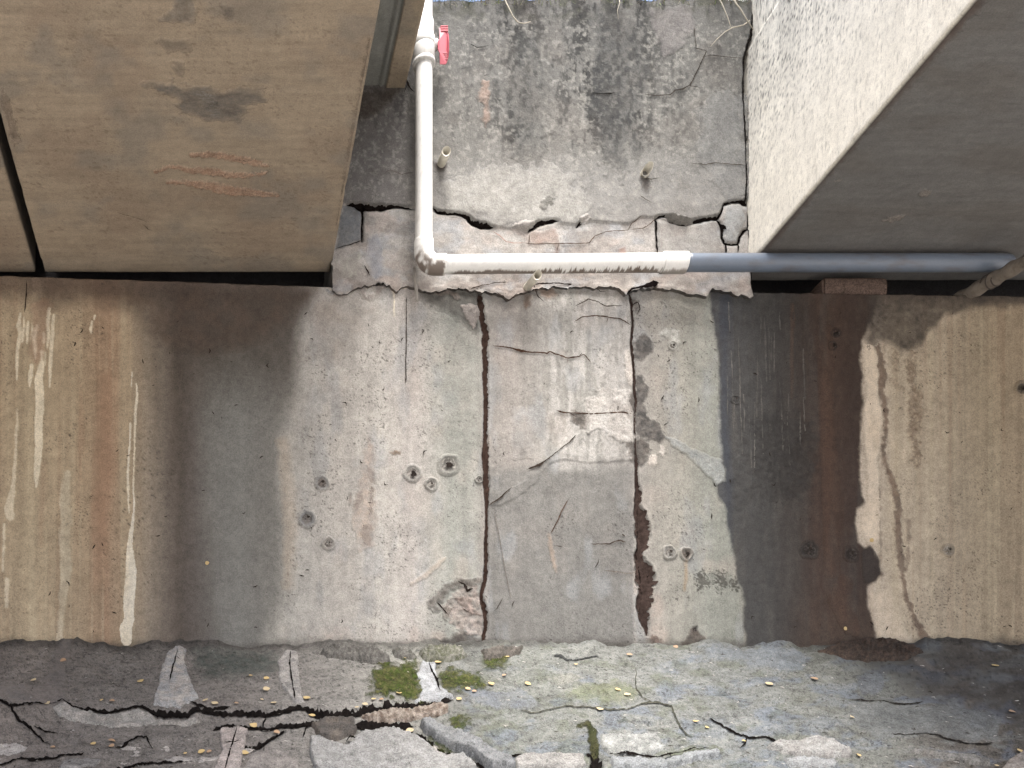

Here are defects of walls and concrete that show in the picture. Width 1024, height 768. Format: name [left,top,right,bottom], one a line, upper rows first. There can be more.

water stain [137,0,269,126]
crack [336,14,753,287]
peeling [663,212,694,226]
crack [0,650,452,768]
water stain [0,276,490,648]
spalling [426,576,486,637]
crack [437,280,659,641]
water stain [689,292,1024,737]